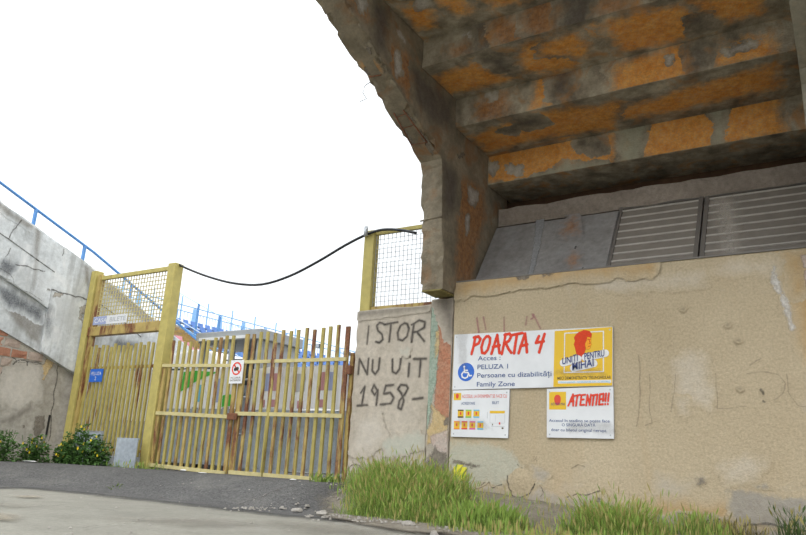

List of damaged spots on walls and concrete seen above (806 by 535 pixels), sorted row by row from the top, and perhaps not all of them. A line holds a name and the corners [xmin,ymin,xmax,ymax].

rust [356,34,417,105]
spalling [393,109,434,156]
rust [393,0,793,302]
crack [5,220,87,300]
water stain [0,203,94,348]
flaking render [0,330,46,375]
peeling [426,308,614,508]